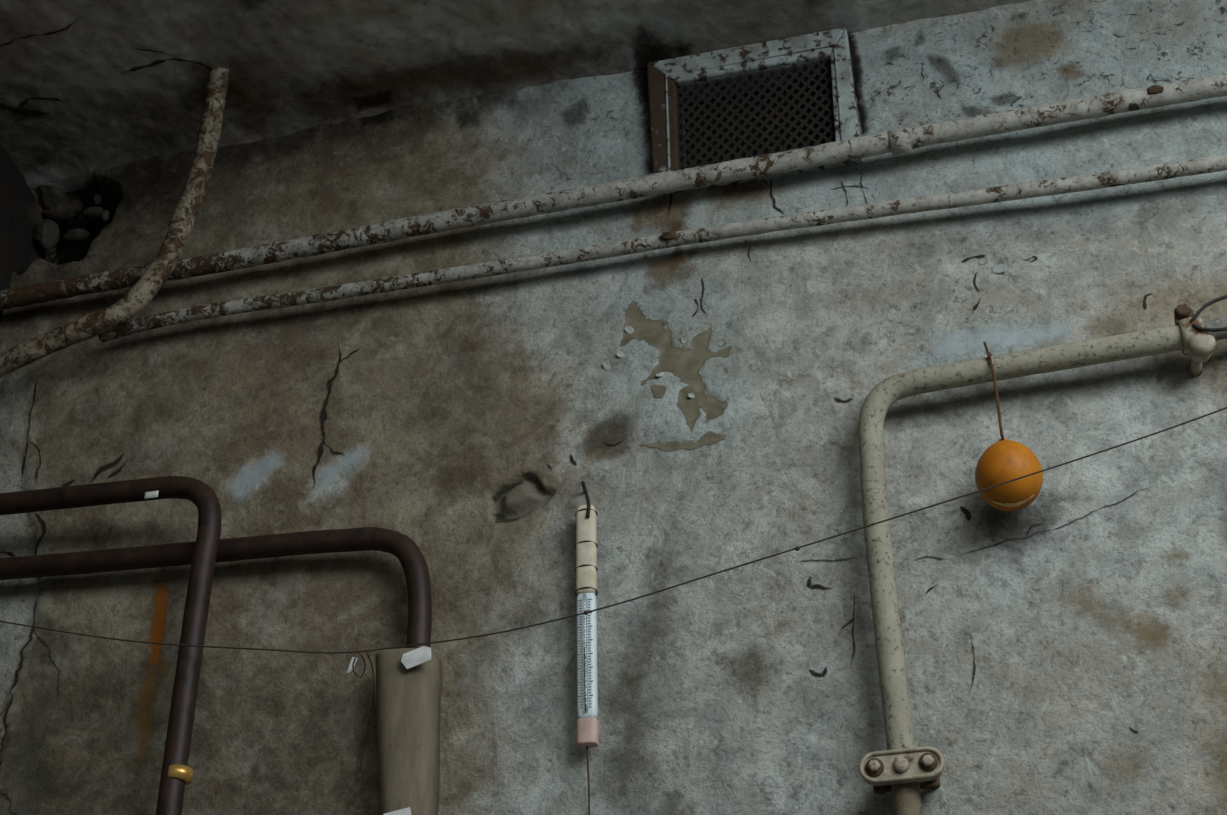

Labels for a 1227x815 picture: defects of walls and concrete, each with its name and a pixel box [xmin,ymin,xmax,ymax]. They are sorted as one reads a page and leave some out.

crack [0,97,64,116]
crack [0,18,81,47]
crack [312,343,360,488]
peeling [602,301,731,451]
crack [0,512,61,815]
corrosion [140,582,167,757]